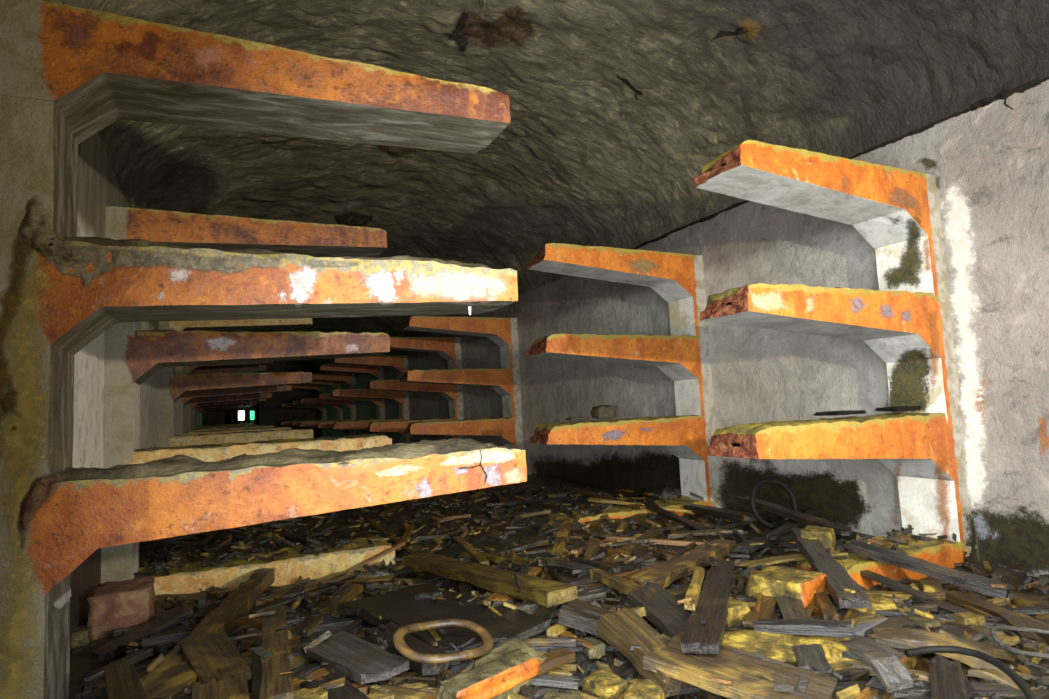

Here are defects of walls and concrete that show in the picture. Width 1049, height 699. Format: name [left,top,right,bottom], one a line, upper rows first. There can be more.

spalling [44,247,280,287]
peeling [278,259,357,307]
spalling [335,212,374,227]
mould [885,217,923,289]
mould [887,348,930,412]
corrosion [929,313,939,383]
leakage [941,185,1049,575]
leakage [0,234,47,699]
corrosion [935,463,950,561]